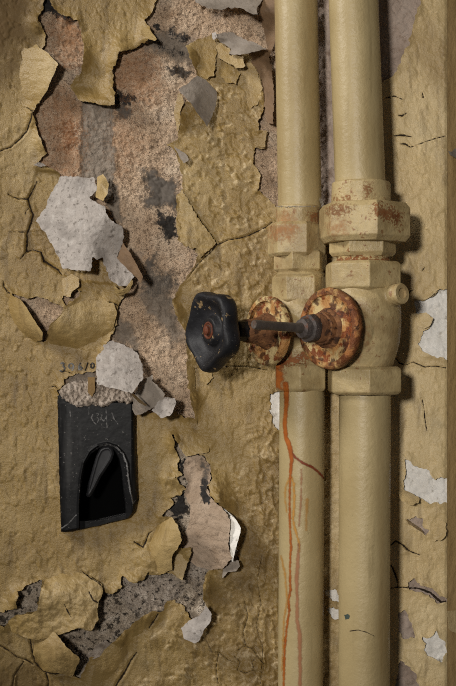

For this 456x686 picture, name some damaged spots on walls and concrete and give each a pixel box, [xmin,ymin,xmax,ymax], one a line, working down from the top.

crack [0,107,33,152]
crack [394,134,444,147]
crack [8,181,62,275]
corrosion [307,184,403,226]
peeling [0,0,279,686]
peeling [414,289,447,360]
peeling [398,459,447,505]
corrosion [276,351,324,686]
peeling [405,516,447,541]
crack [391,565,447,603]
peeling [398,610,447,662]
crack [0,640,74,686]